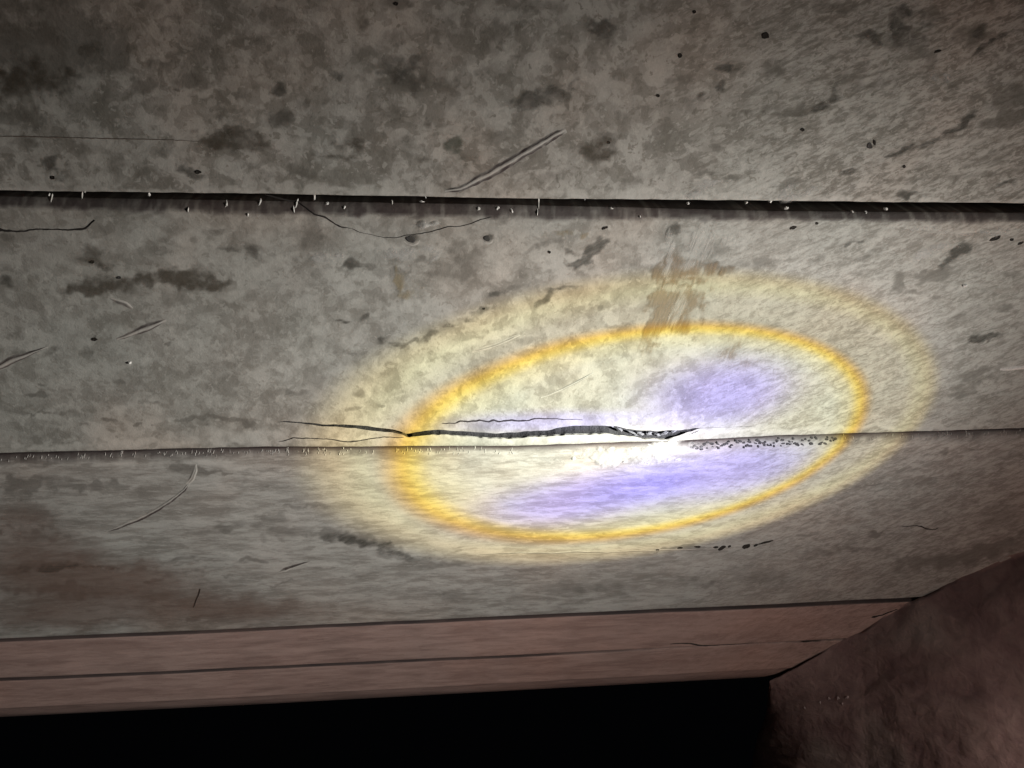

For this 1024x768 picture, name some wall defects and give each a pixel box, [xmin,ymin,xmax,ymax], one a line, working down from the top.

crack [0,220,95,232]
crack [266,195,490,238]
crack [279,418,702,442]